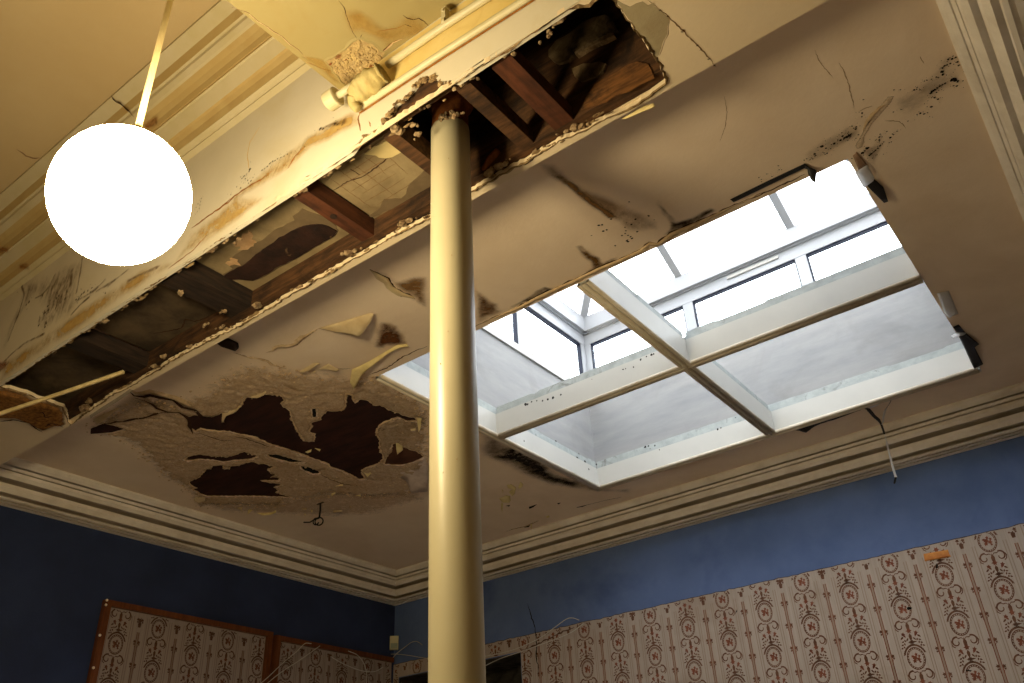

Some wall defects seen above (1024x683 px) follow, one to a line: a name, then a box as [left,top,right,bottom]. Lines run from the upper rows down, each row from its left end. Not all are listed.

spalling [315,0,597,178]
flaking render [471,0,670,193]
mould [804,99,898,161]
crack [815,51,905,131]
mould [900,56,964,122]
damp [5,117,353,373]
damp [555,172,650,246]
damp [670,210,713,232]
peeling [0,211,431,516]
damp [497,448,573,485]